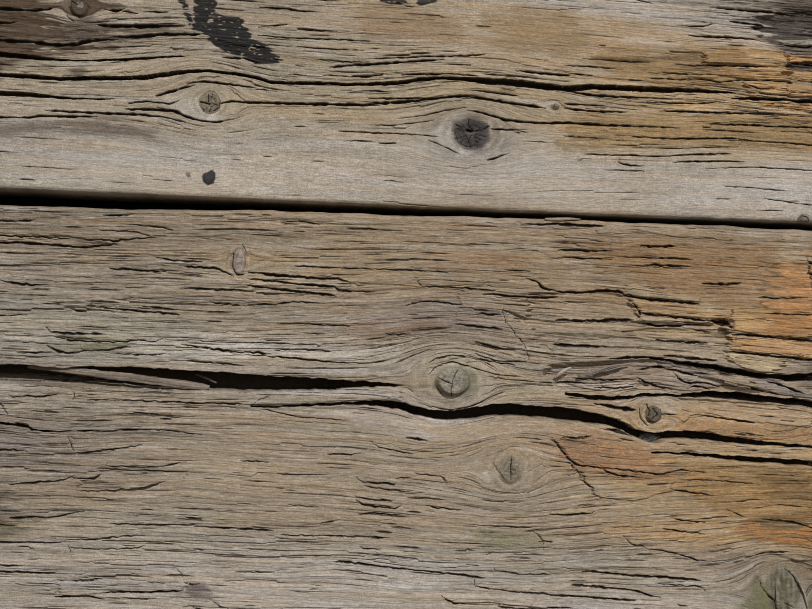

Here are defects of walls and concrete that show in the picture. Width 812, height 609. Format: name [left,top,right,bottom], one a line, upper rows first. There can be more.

peeling [700,39,812,112]
peeling [623,284,812,398]
crack [0,208,812,609]